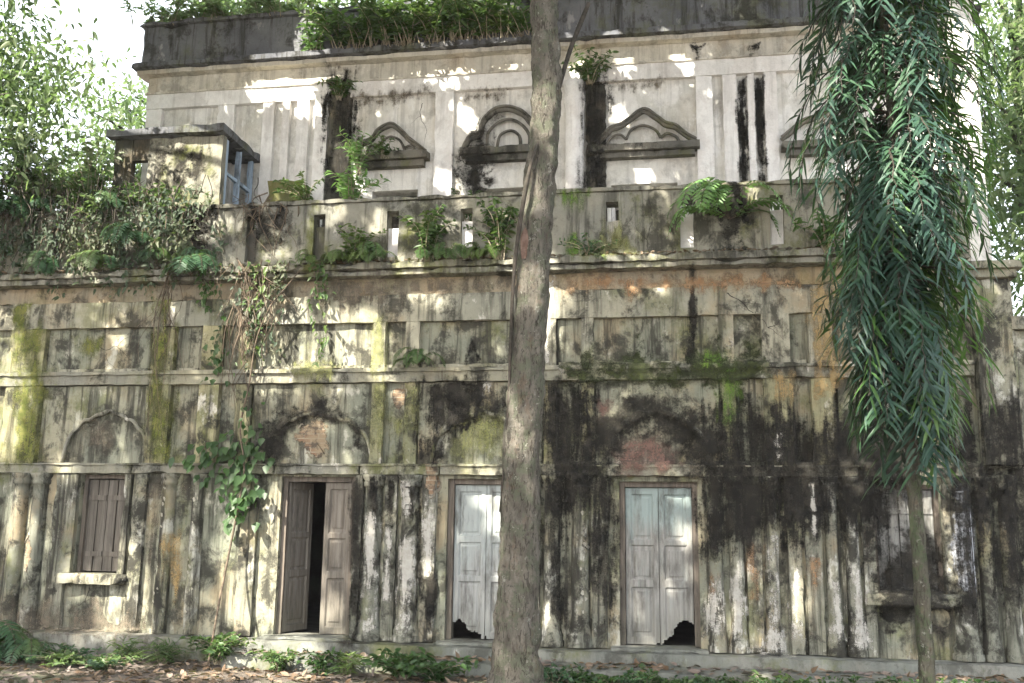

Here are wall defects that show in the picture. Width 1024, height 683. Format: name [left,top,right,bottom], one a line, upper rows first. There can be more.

leakage [453,87,508,195]
leakage [561,66,662,209]
leakage [709,74,768,252]
leakage [12,302,32,330]
spalling [294,416,329,459]
leakage [339,476,440,647]
leakage [391,340,507,466]
spalling [612,432,682,476]
leakage [539,263,915,634]
leakage [919,391,1024,639]